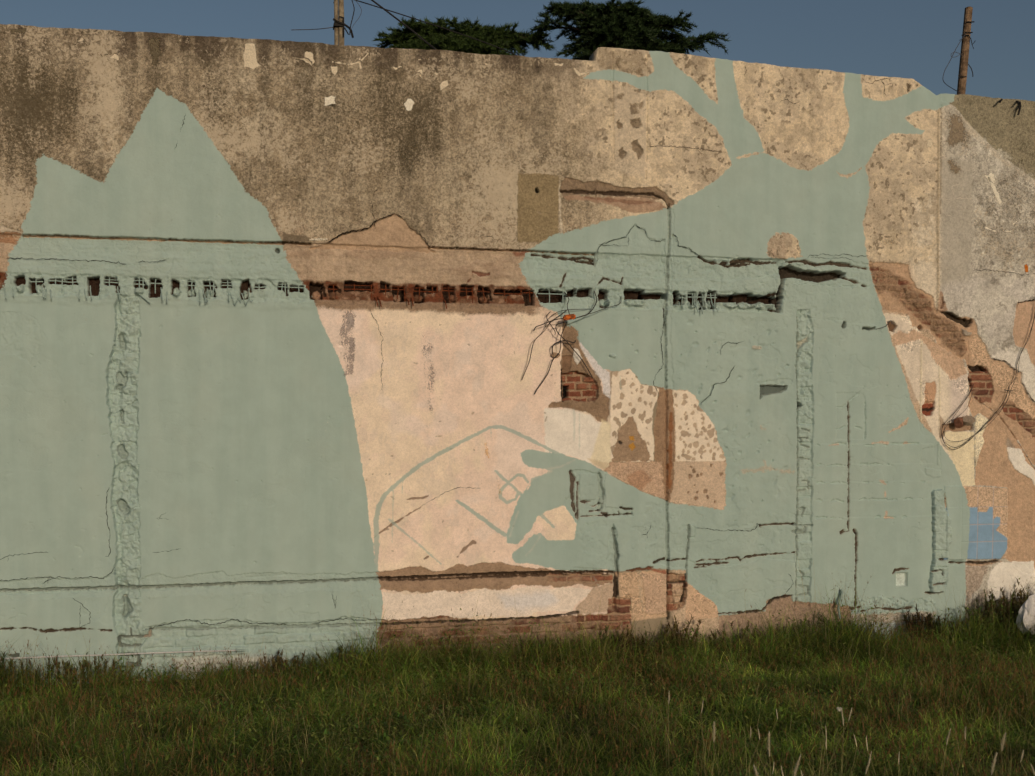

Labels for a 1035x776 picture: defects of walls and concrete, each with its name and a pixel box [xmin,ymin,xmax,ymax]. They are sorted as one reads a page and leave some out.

flaking render [309,214,434,253]
crack [329,188,429,246]
crack [597,226,698,261]
spalling [0,224,1035,650]
crack [143,619,284,631]
flaking render [142,614,632,681]